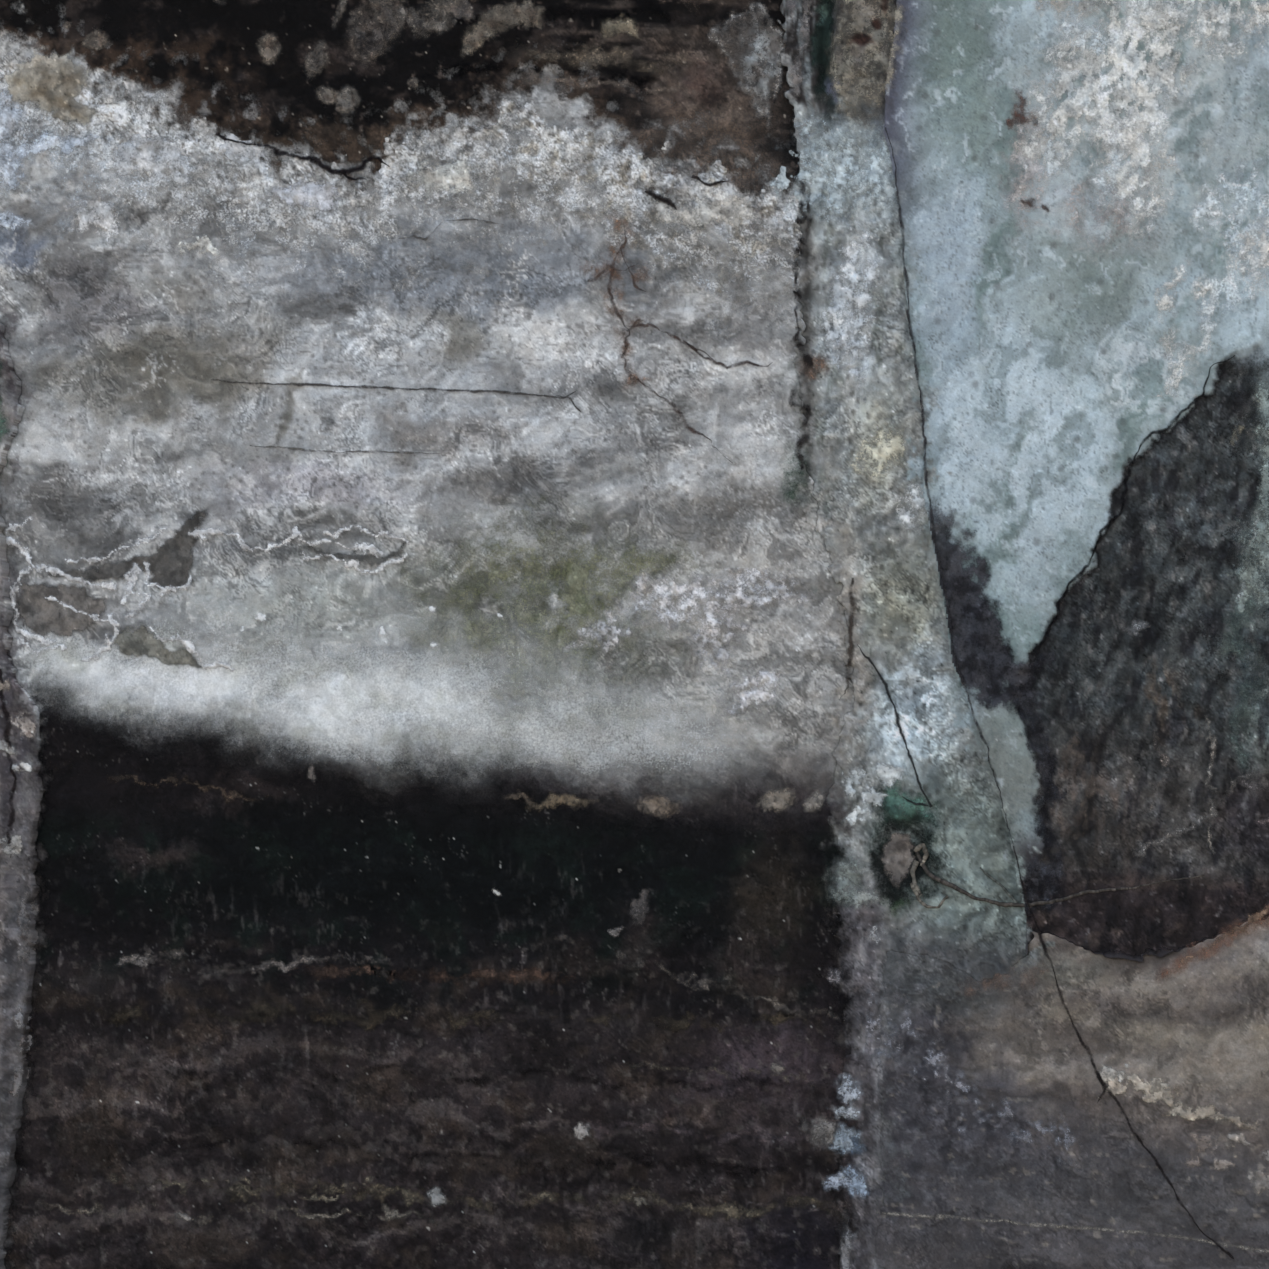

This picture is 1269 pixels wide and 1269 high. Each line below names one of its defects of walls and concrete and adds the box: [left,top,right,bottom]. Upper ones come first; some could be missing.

crack [215,133,390,181]
leakage [0,0,897,313]
crack [214,379,581,412]
crack [588,223,770,462]
crack [789,167,822,473]
peeling [6,510,409,671]
crack [840,578,933,807]
leakage [894,484,1067,915]
crack [876,127,1269,1259]
leakage [3,615,977,1269]
corrosion [1160,907,1269,978]
leakage [1010,1121,1075,1145]